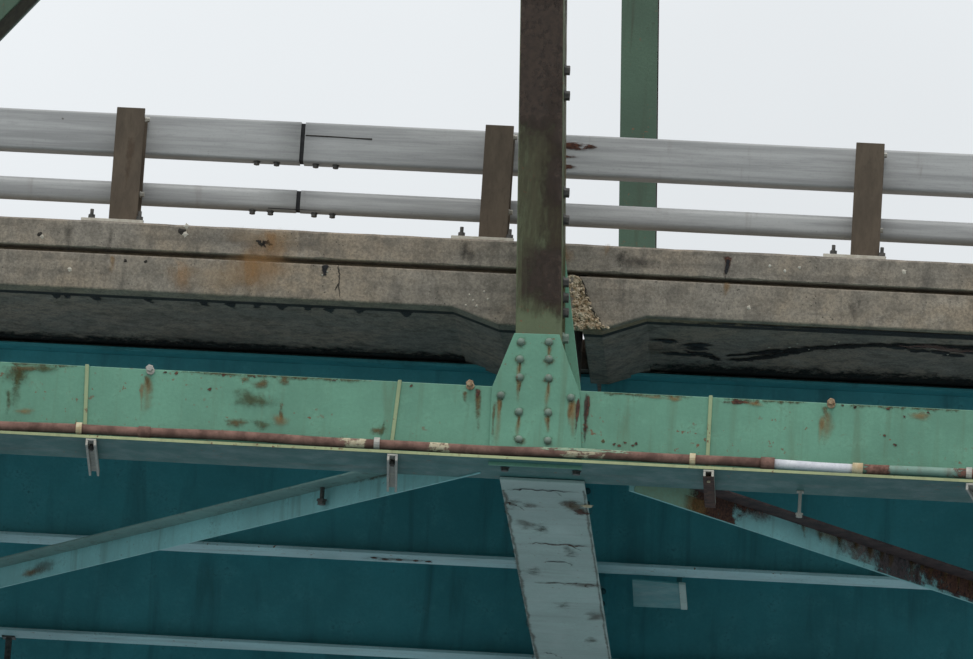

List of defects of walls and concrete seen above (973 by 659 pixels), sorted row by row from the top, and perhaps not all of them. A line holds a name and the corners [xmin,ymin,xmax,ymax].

rust [519,0,596,253]
spalling [568,275,610,331]
rust [7,366,51,402]
rust [243,375,267,404]
rust [569,395,590,437]
rust [864,464,890,475]
rust [688,476,770,524]
rust [819,532,973,602]